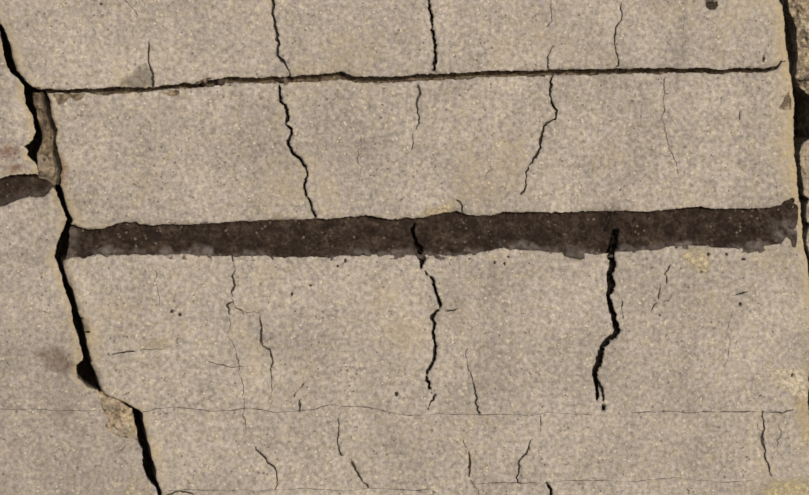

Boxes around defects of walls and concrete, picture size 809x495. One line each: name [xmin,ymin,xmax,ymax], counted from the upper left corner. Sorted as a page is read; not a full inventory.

crack [271,0,316,217]
crack [411,85,422,150]
crack [428,0,437,71]
crack [521,46,558,194]
crack [142,211,751,495]
crack [633,410,792,476]